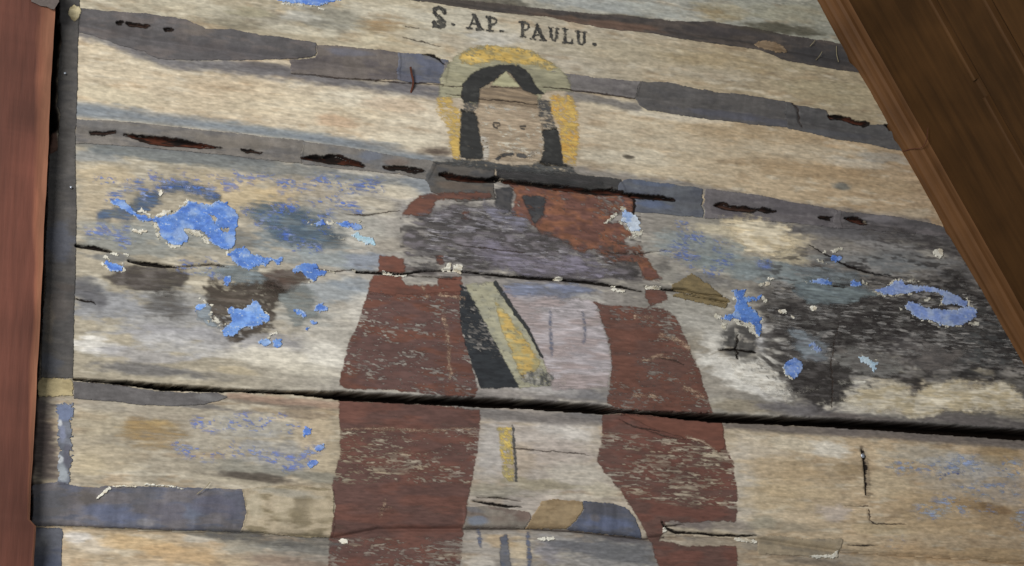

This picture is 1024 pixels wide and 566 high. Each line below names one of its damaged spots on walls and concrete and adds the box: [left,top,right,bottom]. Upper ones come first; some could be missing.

crack [75,244,227,268]
peeling [110,198,335,286]
crack [321,245,688,295]
peeling [604,206,643,238]
damp [863,227,962,257]
peeling [195,297,282,348]
peeling [714,277,774,337]
damp [766,272,1019,411]
peeling [850,278,979,329]
crack [92,382,223,393]
peeling [730,357,809,402]
crack [850,450,896,546]